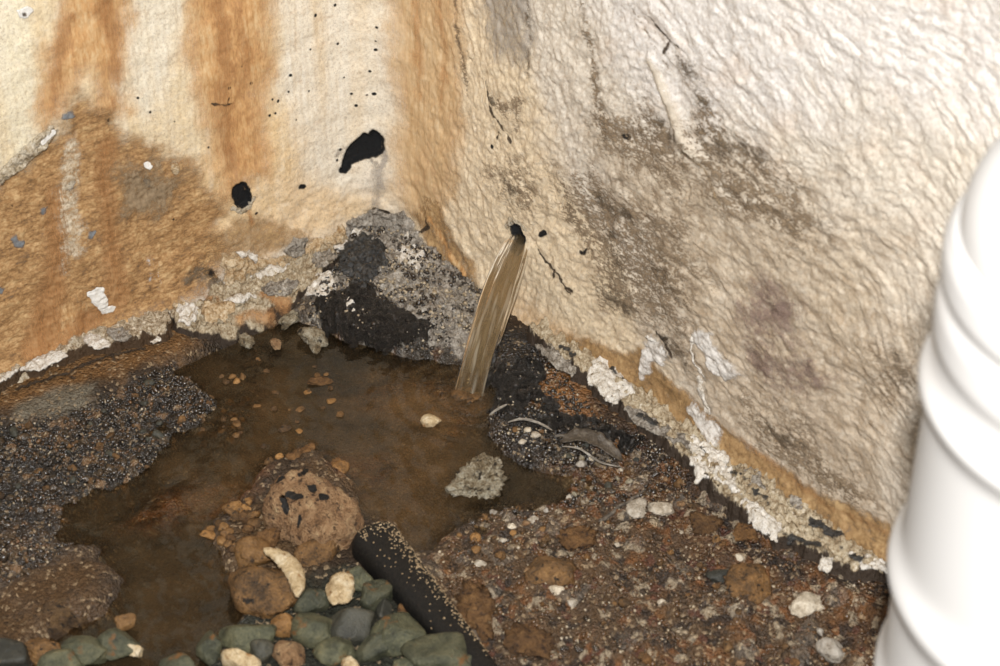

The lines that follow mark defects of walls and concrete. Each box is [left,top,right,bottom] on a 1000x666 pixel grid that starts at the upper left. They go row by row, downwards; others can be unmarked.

rust [39,0,129,116]
spalling [0,88,256,373]
rust [186,0,275,195]
leakage [0,206,503,395]
leakage [488,97,524,132]
leakage [488,158,537,211]
crack [538,249,573,295]
leakage [581,3,832,249]
leakage [526,171,889,583]